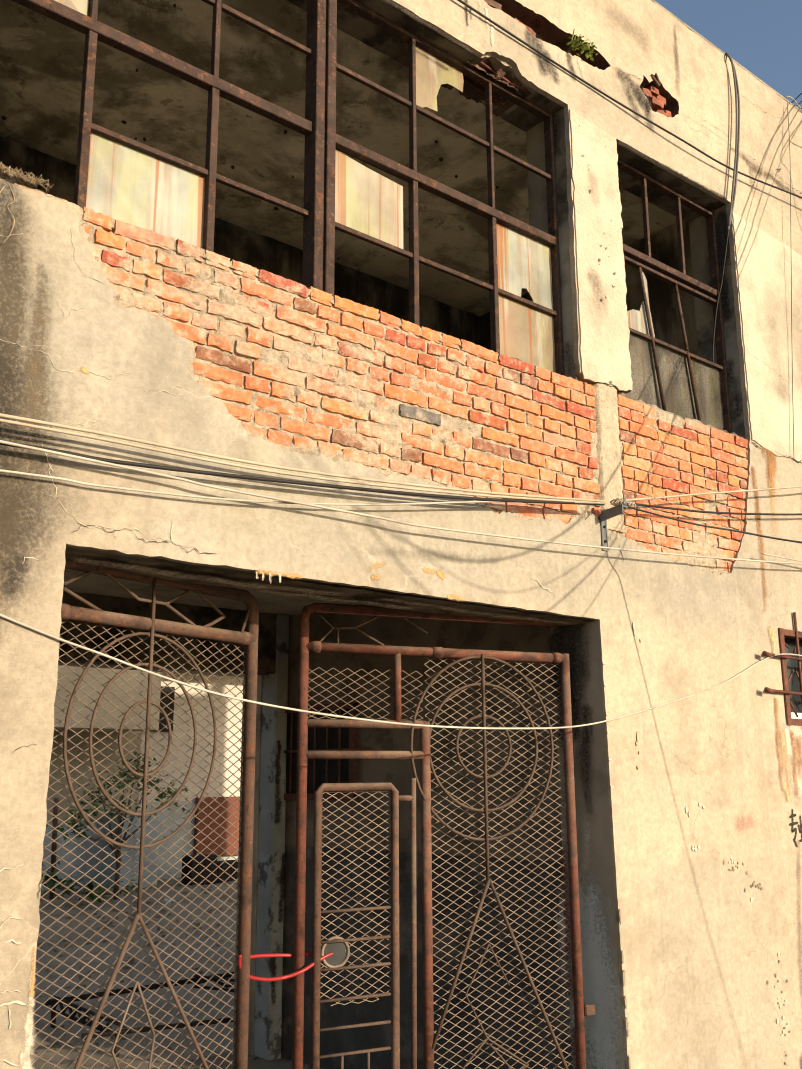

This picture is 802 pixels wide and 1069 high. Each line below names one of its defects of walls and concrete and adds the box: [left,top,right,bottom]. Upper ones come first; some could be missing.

spalling [641,73,672,117]
damp [0,180,47,570]
spalling [13,183,748,575]
crack [42,444,220,554]
rust [752,447,776,597]
rust [775,698,801,793]
crack [0,864,46,944]
crack [0,990,32,1029]